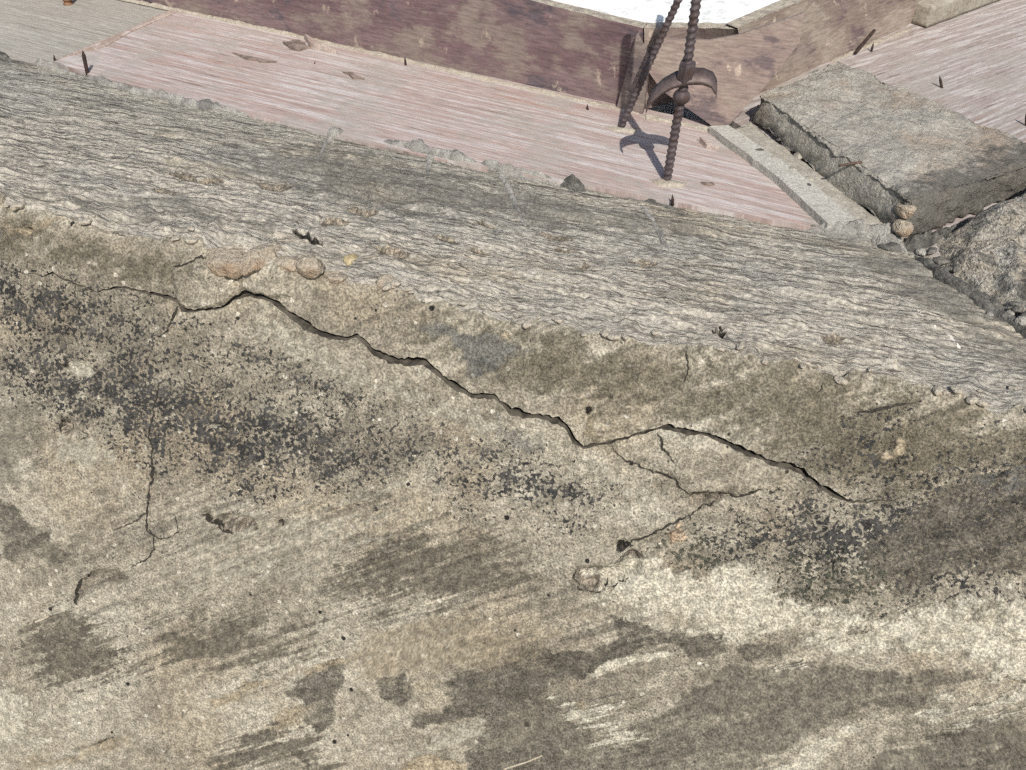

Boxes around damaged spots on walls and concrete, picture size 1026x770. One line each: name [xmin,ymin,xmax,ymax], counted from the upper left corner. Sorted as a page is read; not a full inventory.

crack [174,255,207,267]
spalling [821,333,845,346]
leakage [860,252,1026,367]
leakage [0,260,666,547]
crack [5,271,939,566]
leakage [0,504,70,564]